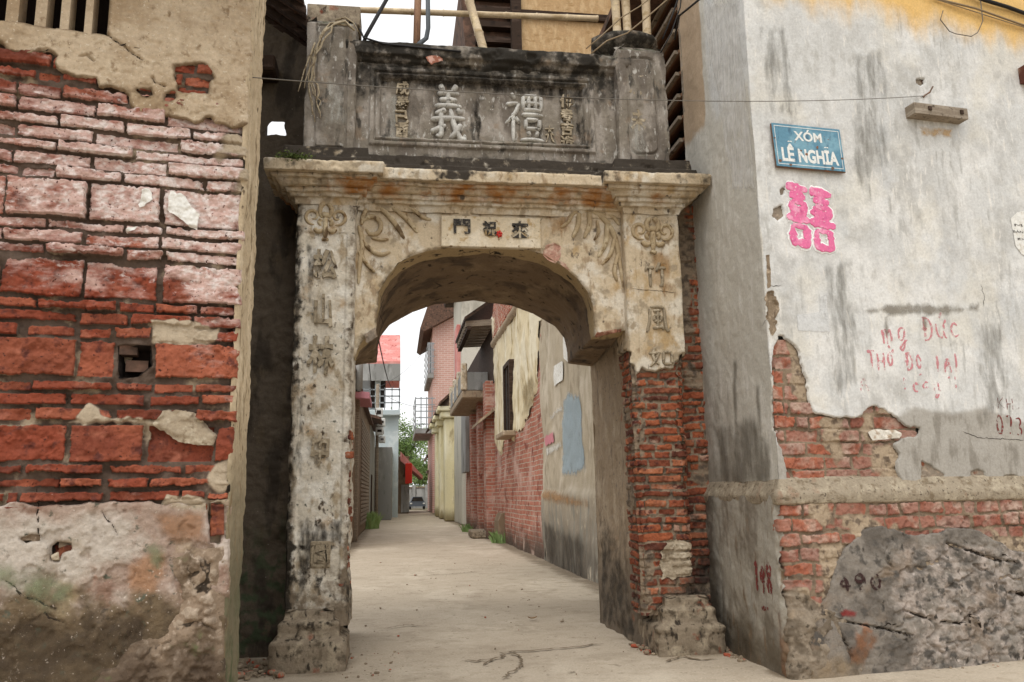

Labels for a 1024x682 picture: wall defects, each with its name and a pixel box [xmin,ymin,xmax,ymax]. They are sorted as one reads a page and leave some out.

water stain [382,68,581,133]
flaking render [0,44,249,682]
flaking render [619,351,695,616]
flaking render [764,255,917,478]